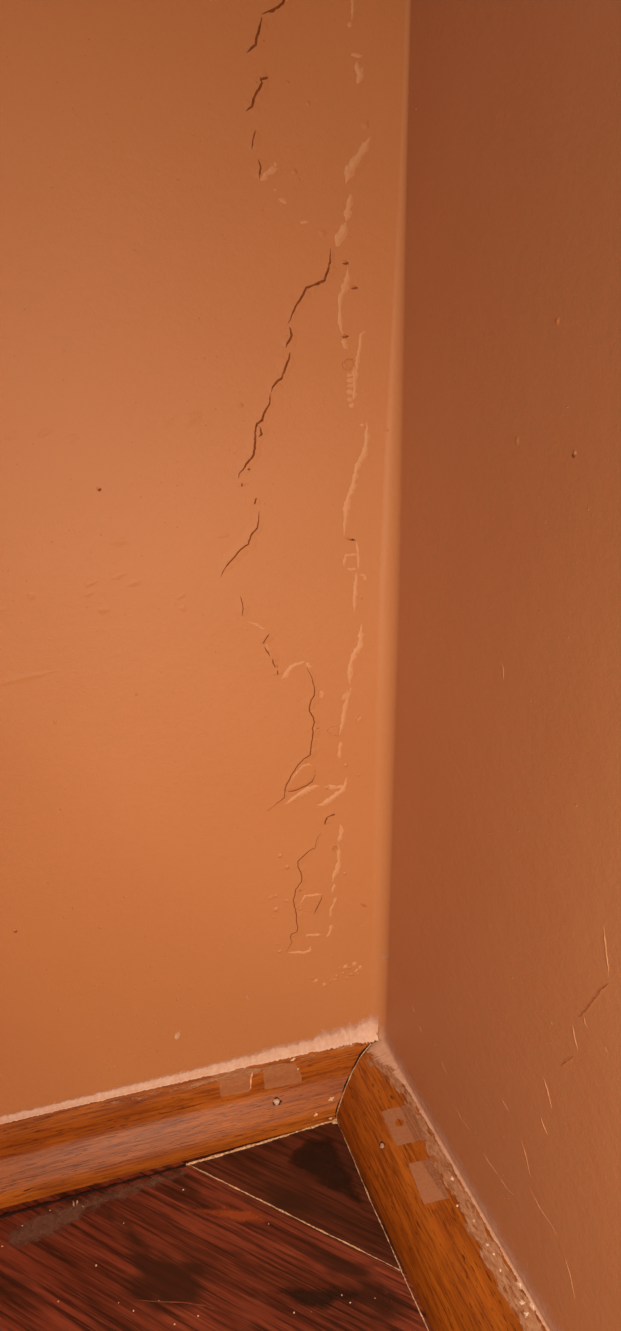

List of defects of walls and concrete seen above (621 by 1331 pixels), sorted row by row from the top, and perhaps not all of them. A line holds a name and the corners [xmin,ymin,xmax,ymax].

crack [240,0,292,116]
crack [217,248,338,952]